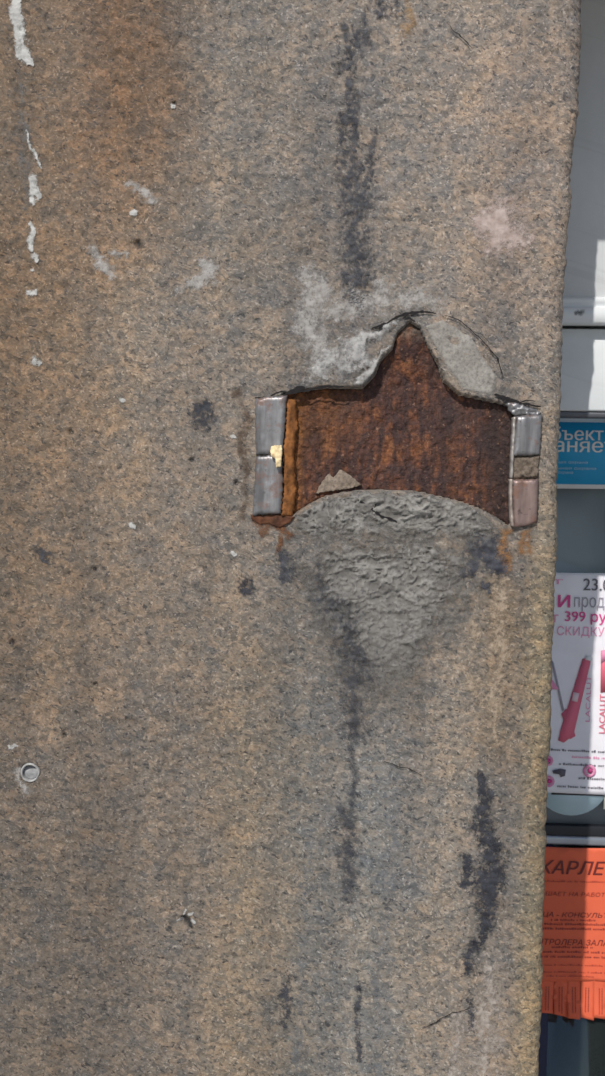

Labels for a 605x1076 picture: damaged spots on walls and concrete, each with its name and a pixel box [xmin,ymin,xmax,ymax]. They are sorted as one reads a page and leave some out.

damp [292,0,446,368]
peeling [309,320,398,385]
crack [371,310,541,407]
damp [459,770,508,976]
damp [465,997,477,1029]